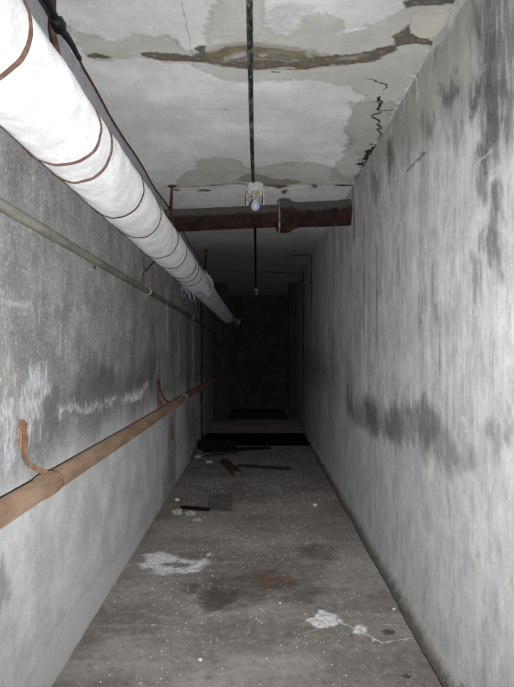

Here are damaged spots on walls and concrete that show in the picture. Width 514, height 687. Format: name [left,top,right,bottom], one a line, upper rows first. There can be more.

damp [404,0,455,8]
damp [141,5,468,161]
crack [367,78,392,134]
damp [232,174,299,194]
damp [0,356,159,478]
damp [139,552,211,575]
damp [306,610,380,642]